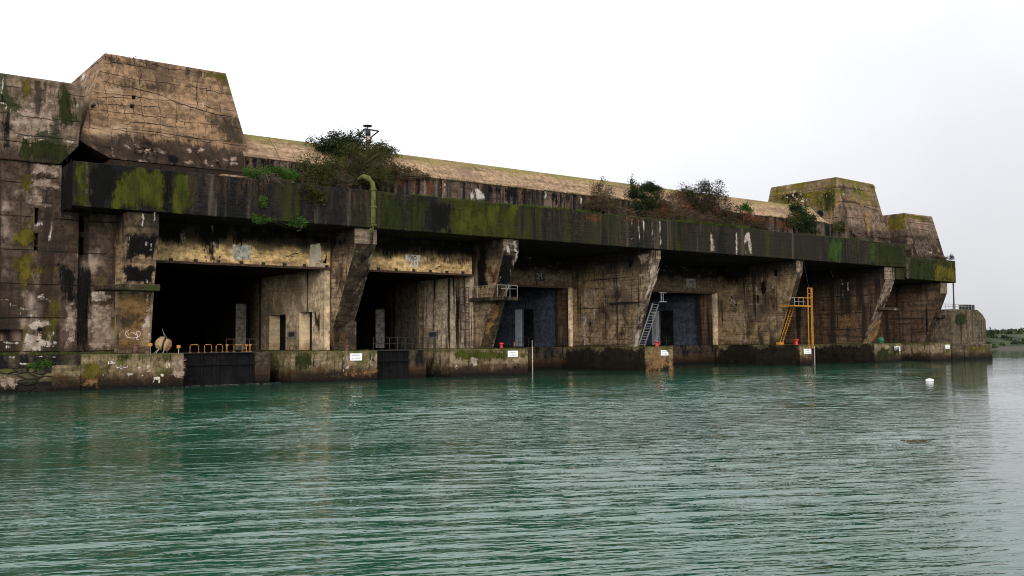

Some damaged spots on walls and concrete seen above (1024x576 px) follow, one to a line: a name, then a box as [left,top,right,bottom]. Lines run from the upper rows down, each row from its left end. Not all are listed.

leakage [33,79,51,114]
crack [97,55,231,142]
peeling [112,138,238,167]
leakage [89,163,118,208]
leakage [470,186,585,239]
spalling [499,253,513,285]
peeling [23,302,77,351]
peeling [88,291,115,350]